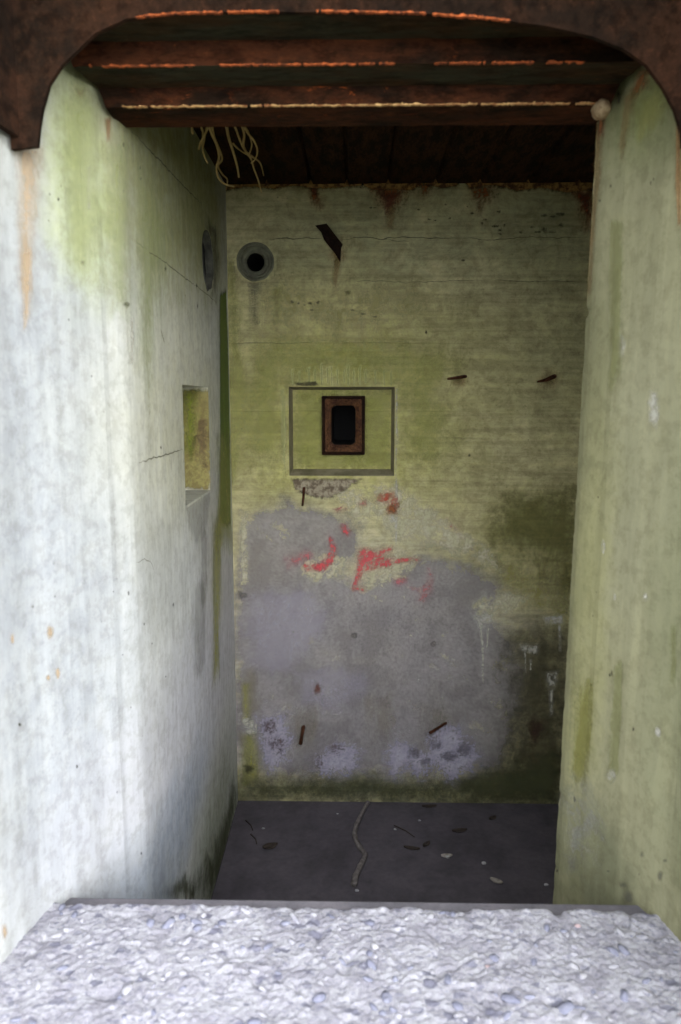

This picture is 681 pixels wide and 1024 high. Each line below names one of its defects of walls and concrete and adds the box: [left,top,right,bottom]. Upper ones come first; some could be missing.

corrosion [572,191,592,230]
crack [272,235,449,243]
spalling [293,478,362,498]
water stain [213,290,592,788]
flaking render [243,715,293,771]